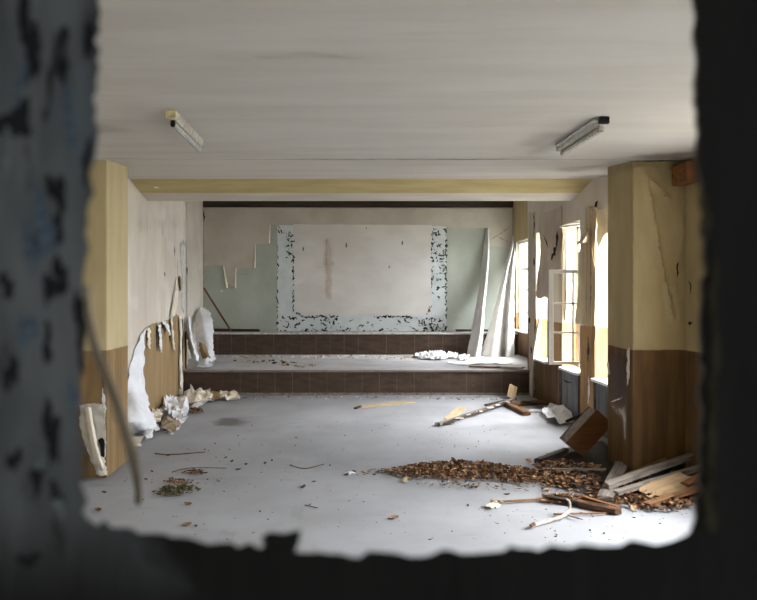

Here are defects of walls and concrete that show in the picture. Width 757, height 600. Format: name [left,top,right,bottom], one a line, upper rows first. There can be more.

peeling [0,0,42,179]
peeling [82,134,93,187]
peeling [83,13,95,67]
peeling [29,396,65,520]
peeling [18,173,87,376]
peeling [68,378,108,477]
peeling [128,276,216,435]
peeling [575,206,608,414]